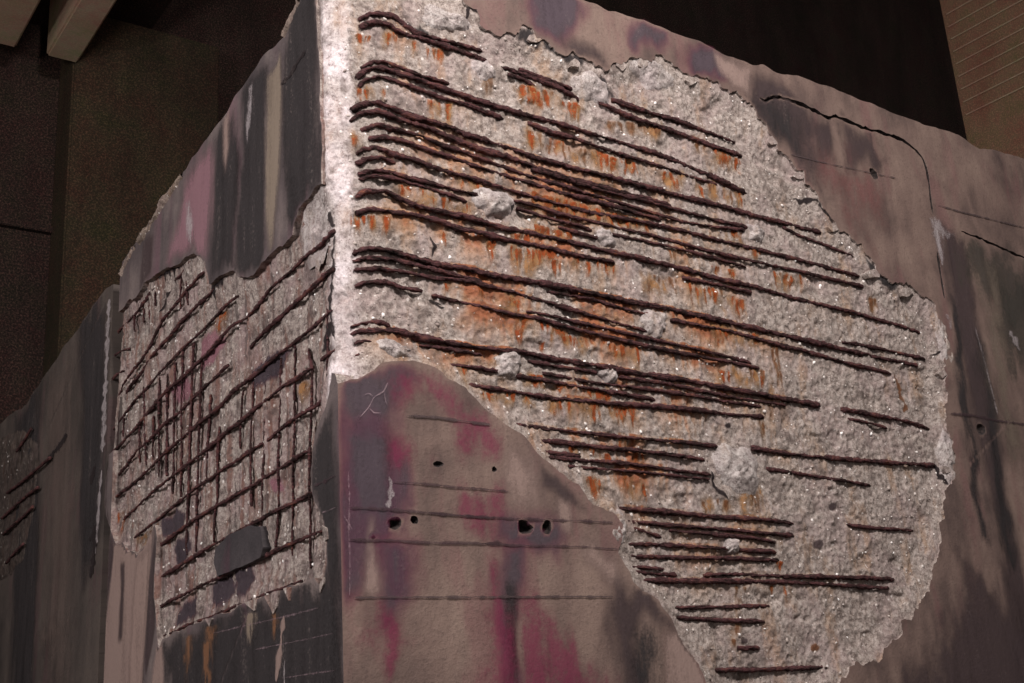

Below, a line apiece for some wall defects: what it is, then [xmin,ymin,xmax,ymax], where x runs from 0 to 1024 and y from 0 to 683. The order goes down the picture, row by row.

water stain [170,0,321,275]
rust [519,84,581,121]
spalling [514,200,617,232]
rust [510,189,649,277]
rust [525,127,638,174]
crack [793,198,833,223]
crack [760,95,933,214]
crack [961,231,1024,258]
spalling [112,218,305,448]
spalling [117,364,328,638]
water stain [902,221,1024,683]
water stain [500,473,577,683]